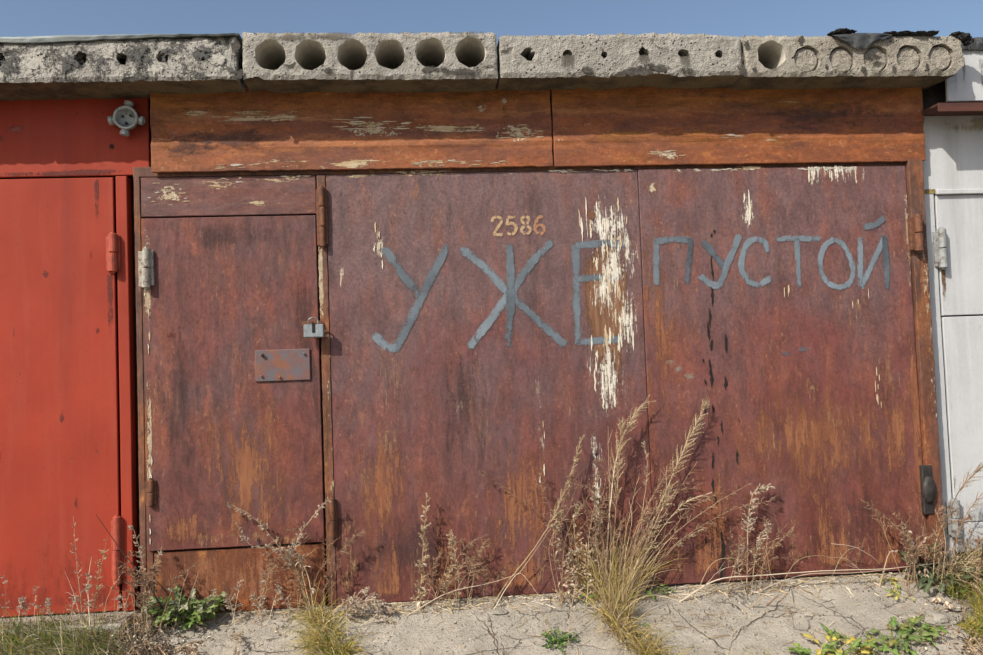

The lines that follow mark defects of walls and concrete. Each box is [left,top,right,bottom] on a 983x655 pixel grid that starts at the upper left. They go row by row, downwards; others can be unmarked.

peeling [147,182,189,205]
peeling [202,159,310,189]
peeling [321,159,506,178]
peeling [332,110,543,144]
peeling [798,166,864,185]
peeling [579,195,639,413]
rust [904,195,933,352]
rust [166,401,309,609]
rust [341,421,413,596]
rust [472,447,555,588]
rust [694,474,742,575]
rust [728,333,935,572]